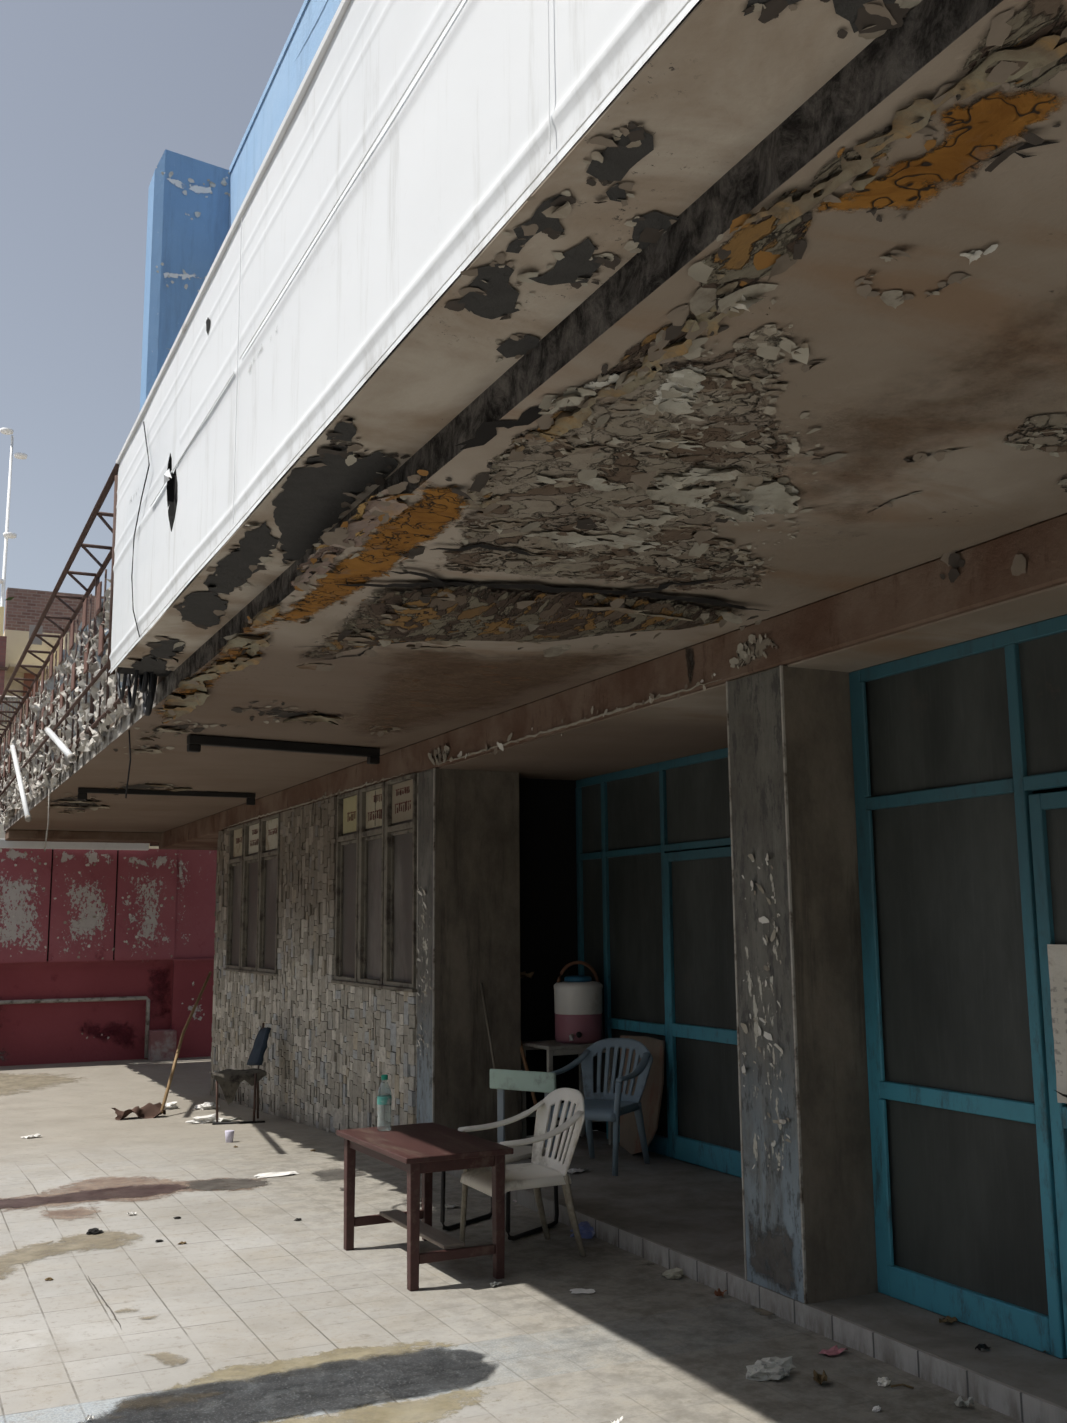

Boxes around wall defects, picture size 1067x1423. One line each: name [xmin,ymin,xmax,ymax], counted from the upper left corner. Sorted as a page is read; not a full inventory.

peeling [156,167,230,220]
rust [816,68,1063,222]
peeling [156,262,206,292]
peeling [435,0,1067,592]
peeling [173,417,428,630]
peeling [129,637,185,674]
peeling [0,848,190,959]
peeling [741,854,791,1171]
water stain [0,1176,268,1212]
water stain [82,1341,499,1423]